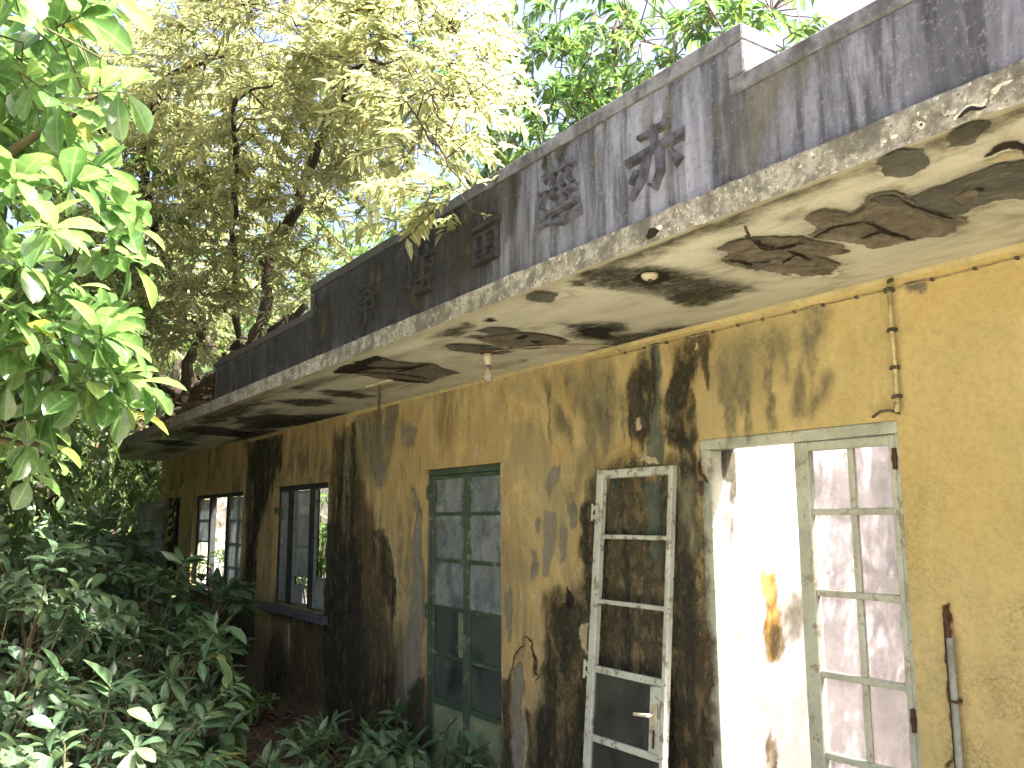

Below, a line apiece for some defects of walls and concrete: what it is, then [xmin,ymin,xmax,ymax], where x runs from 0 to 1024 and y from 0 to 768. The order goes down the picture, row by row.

spalling [946,80,1013,147]
spalling [876,134,930,178]
spalling [717,141,1024,277]
water stain [581,266,751,306]
spalling [445,318,570,354]
spalling [333,356,460,384]
water stain [144,387,395,748]
water stain [533,322,774,768]
crack [509,635,540,681]